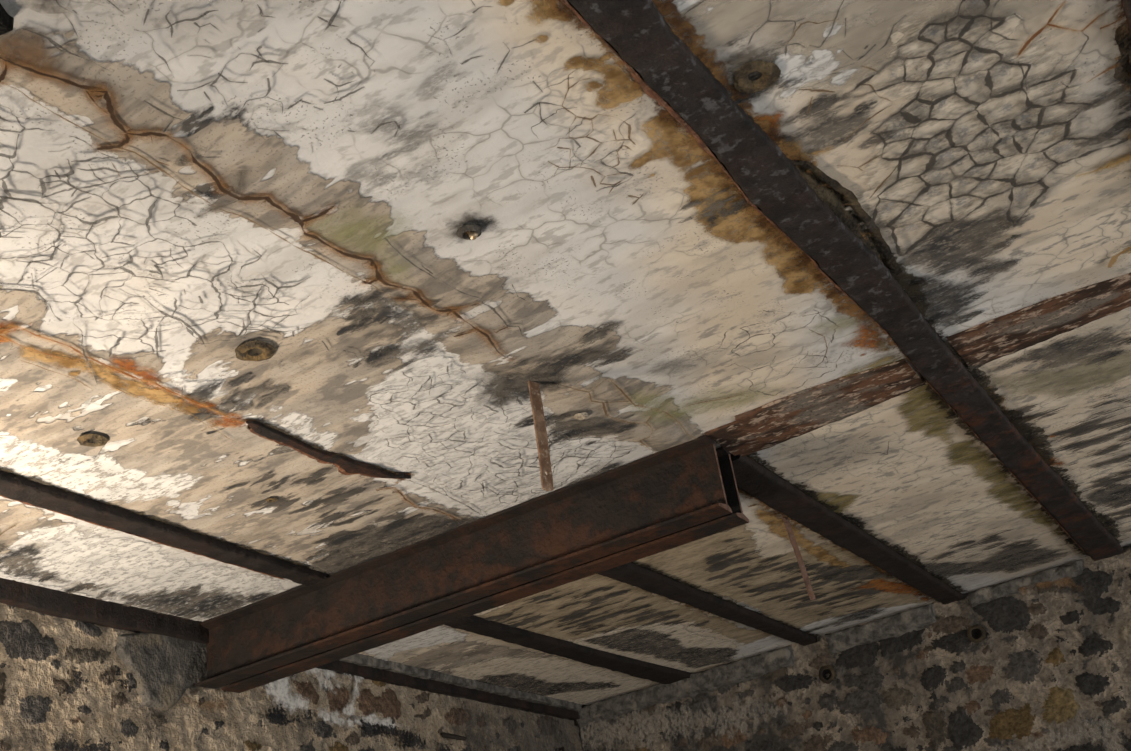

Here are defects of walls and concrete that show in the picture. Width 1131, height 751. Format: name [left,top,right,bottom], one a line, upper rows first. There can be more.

crack [0,0,535,441]
crack [524,71,652,204]
water stain [679,188,747,226]
rust [528,0,906,357]
water stain [775,95,906,153]
crack [748,0,1131,257]
rust [22,347,414,484]
peeling [0,286,618,571]
water stain [335,286,450,373]
water stain [482,322,632,406]
crack [369,309,843,520]
rust [738,488,850,569]